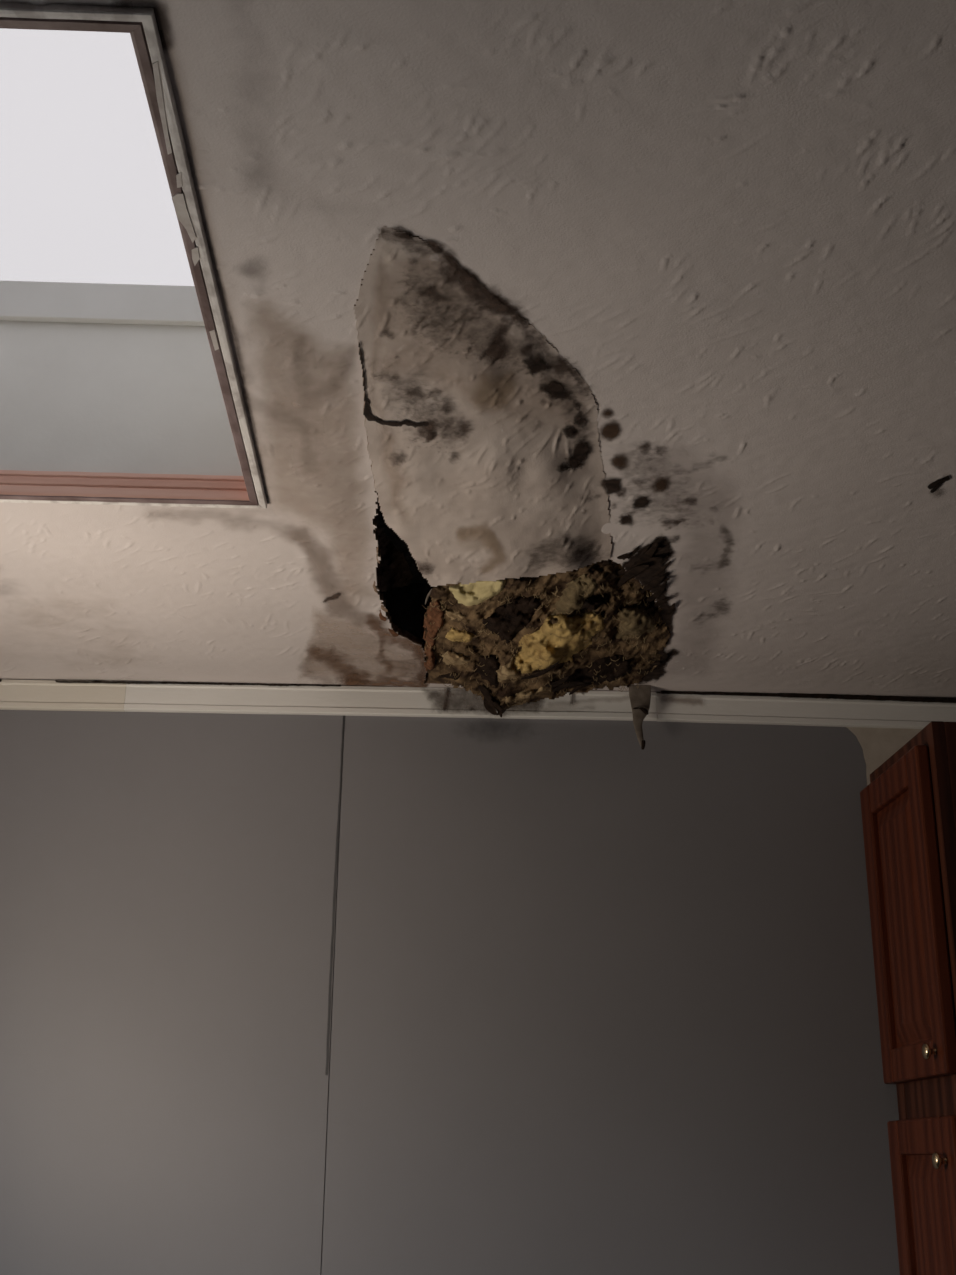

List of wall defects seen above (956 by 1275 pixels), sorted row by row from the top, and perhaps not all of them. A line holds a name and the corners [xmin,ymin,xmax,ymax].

crack [358,342,429,428]
water stain [394,228,591,472]
water stain [601,410,620,441]
water stain [601,456,668,525]
water stain [294,533,345,611]
peeling [603,542,671,603]
water stain [622,521,682,684]